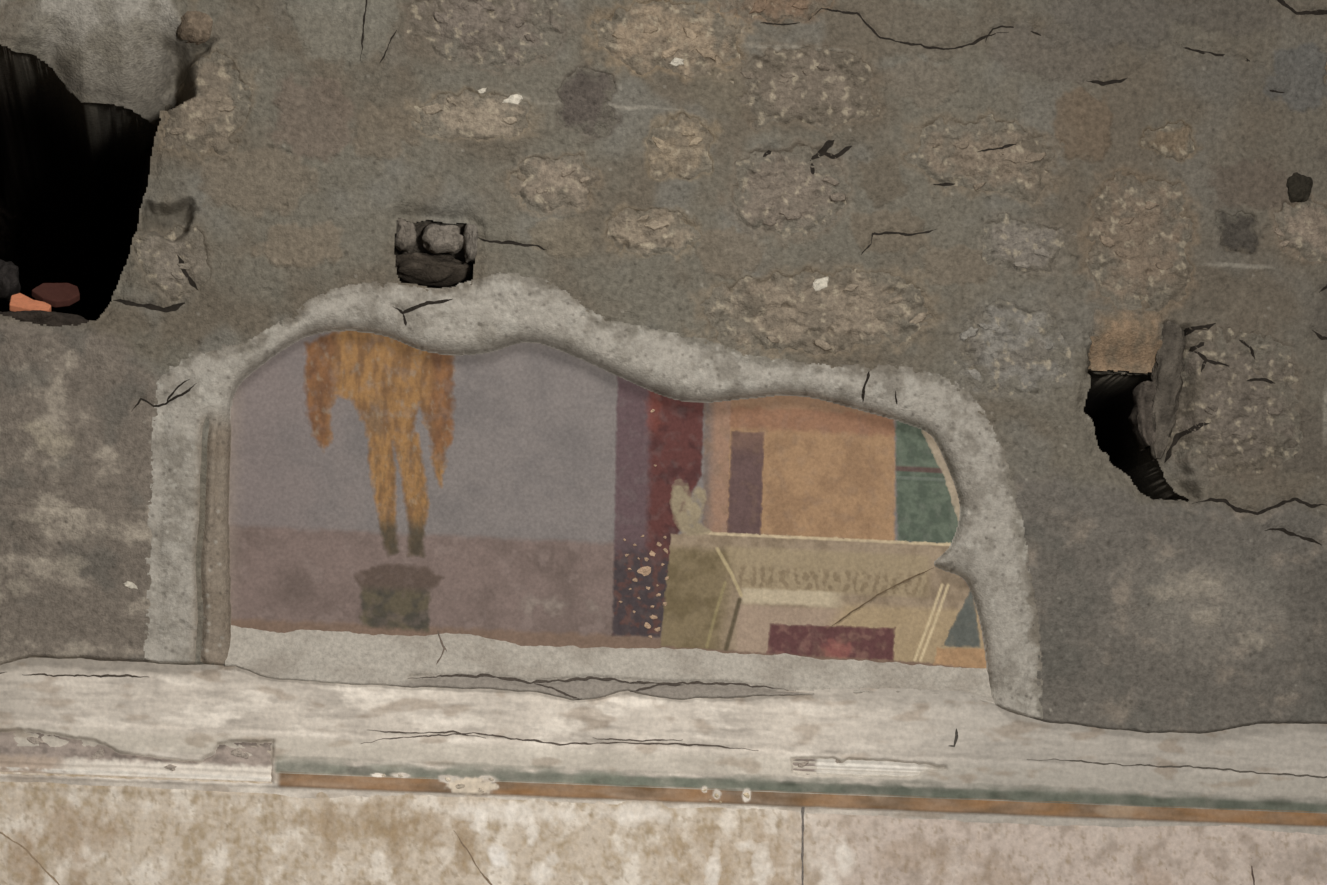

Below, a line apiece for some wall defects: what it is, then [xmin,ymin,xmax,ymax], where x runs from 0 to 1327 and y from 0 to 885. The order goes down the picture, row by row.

crack [360,0,397,62]
crack [762,8,1041,50]
crack [1277,0,1327,15]
spalling [0,44,253,321]
crack [133,379,197,409]
spalling [1084,327,1303,502]
crack [827,568,933,629]
crack [0,671,148,679]
crack [407,630,789,700]
crack [361,730,758,751]
crack [453,830,492,885]